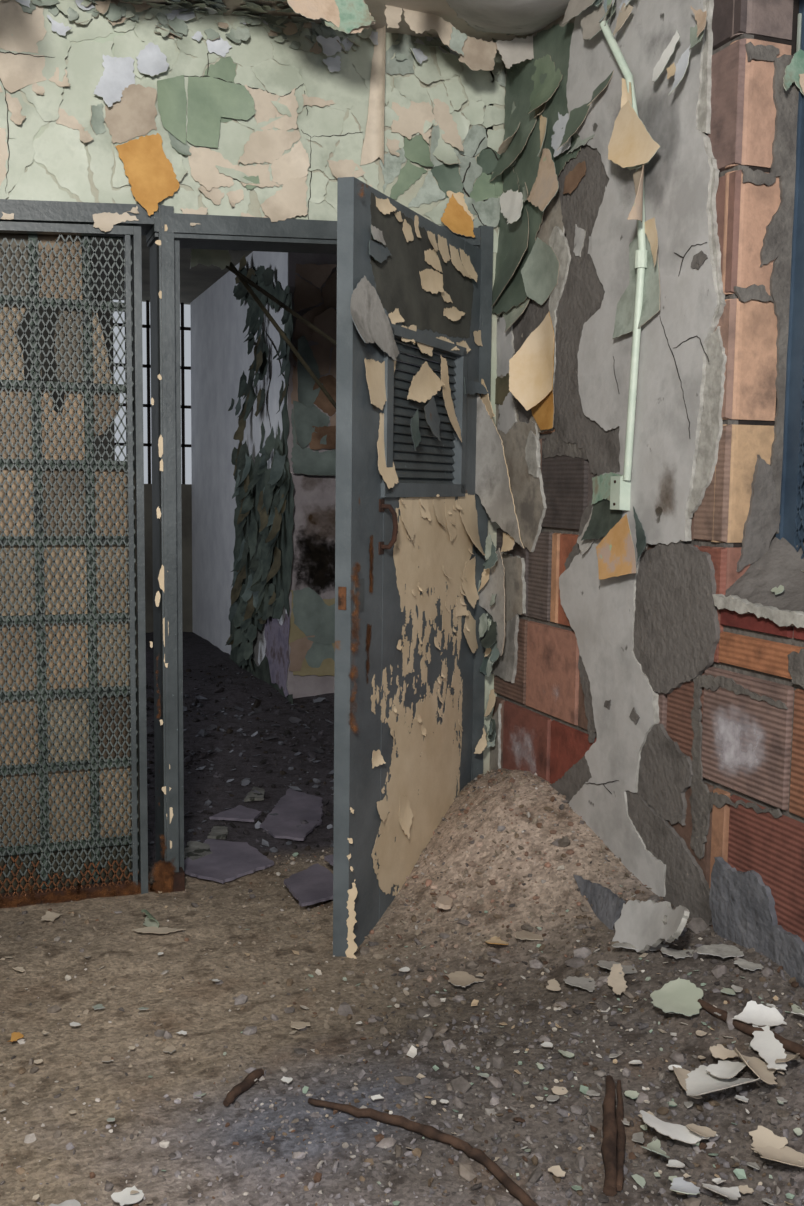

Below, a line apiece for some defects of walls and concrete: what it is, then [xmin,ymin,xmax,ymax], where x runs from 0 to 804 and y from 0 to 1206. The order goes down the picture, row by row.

crack [0,51,54,191]
crack [187,52,362,220]
peeling [608,78,661,339]
spalling [652,0,804,572]
damp [298,538,335,593]
spalling [626,506,804,988]
corrosion [0,837,174,908]
peeling [345,838,358,959]
peeling [445,971,485,987]
peeling [485,930,543,945]
peeling [546,964,628,995]
peeling [706,1001,804,1085]